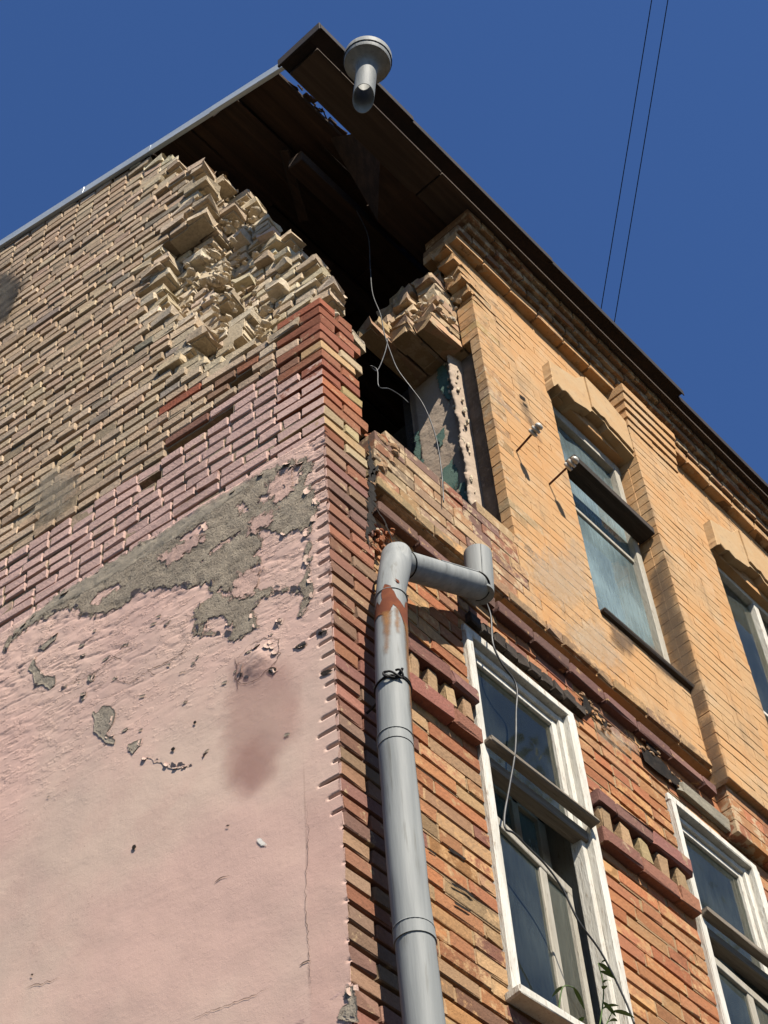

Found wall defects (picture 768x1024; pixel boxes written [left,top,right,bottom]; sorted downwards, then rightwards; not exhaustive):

spalling [177,198,300,343]
spalling [405,276,462,324]
peeling [437,362,476,503]
peeling [3,456,320,653]
peeling [28,632,96,700]
peeling [92,705,192,769]